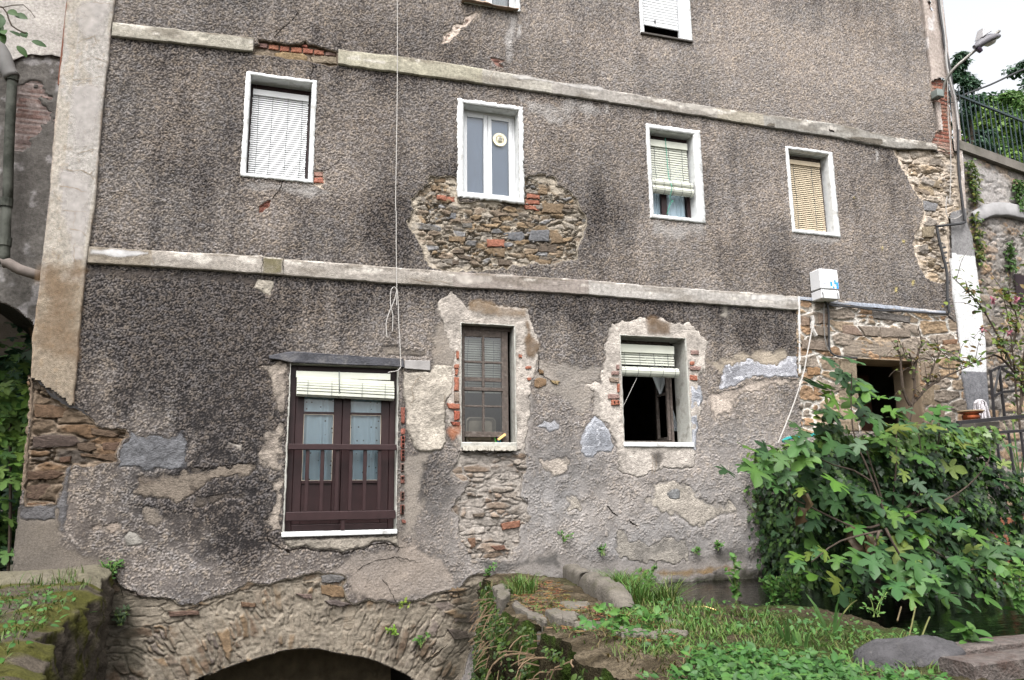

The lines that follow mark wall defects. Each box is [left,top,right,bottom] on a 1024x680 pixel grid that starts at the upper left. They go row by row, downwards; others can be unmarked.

spalling [253,39,338,67]
flaking render [847,79,962,284]
flaking render [406,173,587,273]
flaking render [519,354,560,388]
flaking render [608,365,620,405]
flaking render [690,350,701,381]
flaking render [20,375,130,508]
flaking render [133,361,289,531]
flaking render [400,351,460,523]
crack [114,576,166,600]
crack [267,535,418,605]